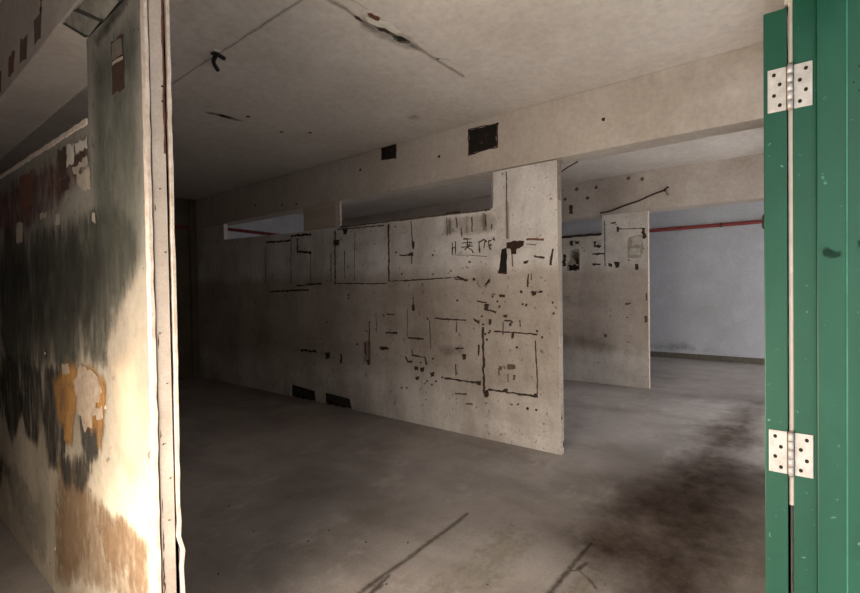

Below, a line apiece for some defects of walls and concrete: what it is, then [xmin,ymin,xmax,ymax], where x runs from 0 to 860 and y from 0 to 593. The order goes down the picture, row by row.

water stain [0,30,147,593]
peeling [61,363,106,432]
crack [360,512,469,593]
crack [549,543,598,593]